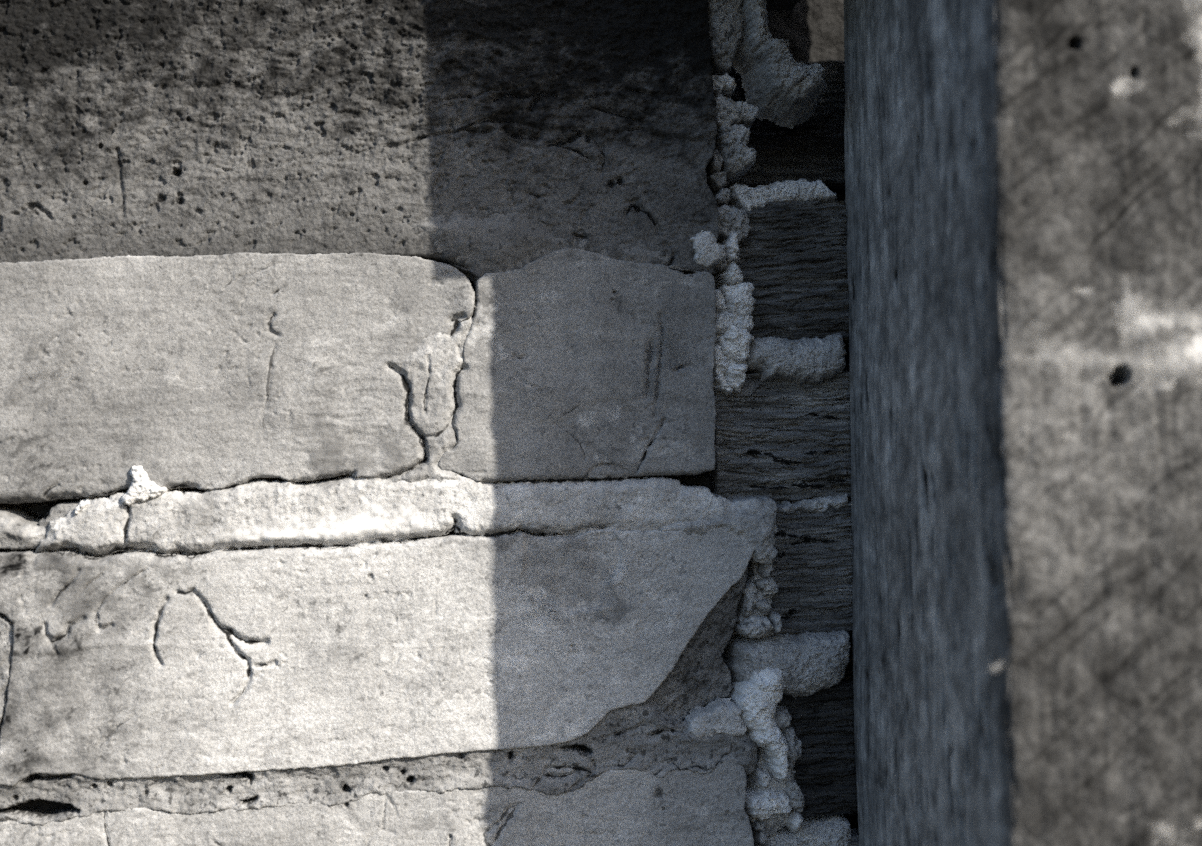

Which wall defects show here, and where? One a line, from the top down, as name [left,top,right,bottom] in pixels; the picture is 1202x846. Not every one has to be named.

crack [451,299,477,336]
crack [386,366,463,477]
crack [2,485,605,654]
crack [153,590,268,704]
spalling [643,568,748,721]